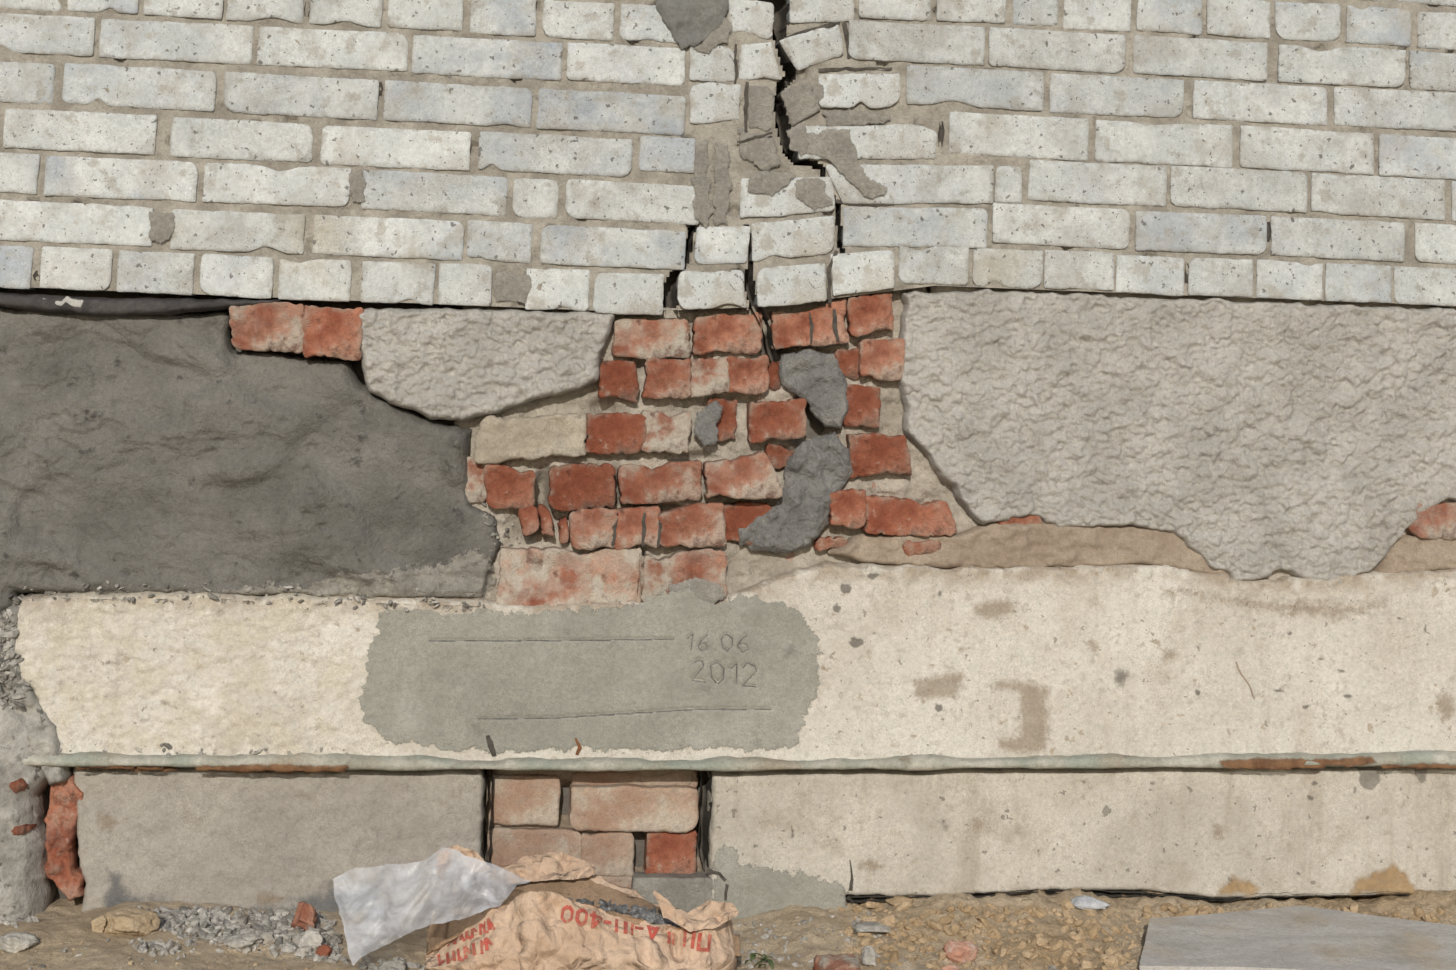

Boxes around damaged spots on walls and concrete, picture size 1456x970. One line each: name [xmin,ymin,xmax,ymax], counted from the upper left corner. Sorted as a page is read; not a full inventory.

crack [664,221,700,308]
crack [734,0,894,362]